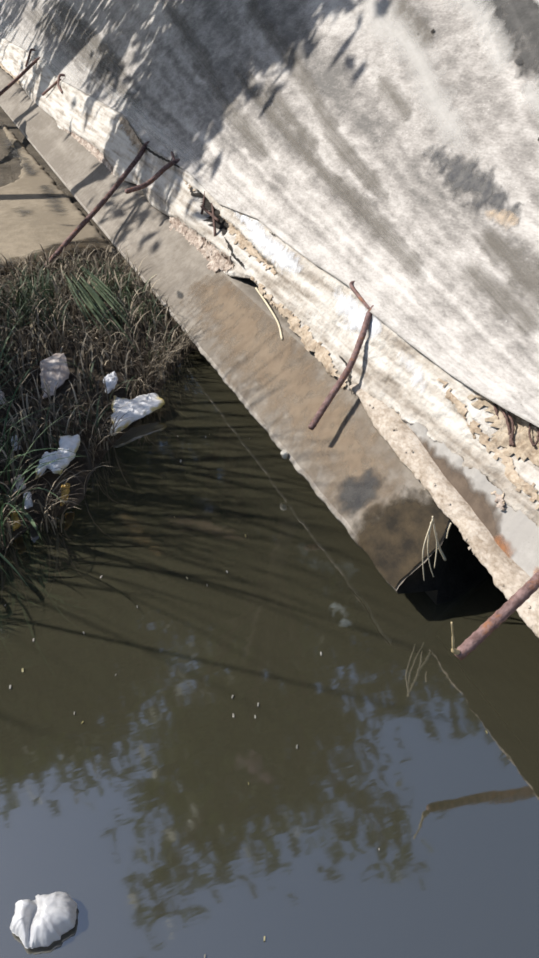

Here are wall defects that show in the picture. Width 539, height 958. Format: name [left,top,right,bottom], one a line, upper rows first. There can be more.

spalling [64,129,113,174]
spalling [119,117,142,153]
damp [423,147,519,220]
spalling [169,215,276,275]
spalling [250,276,347,388]
spalling [437,378,539,511]